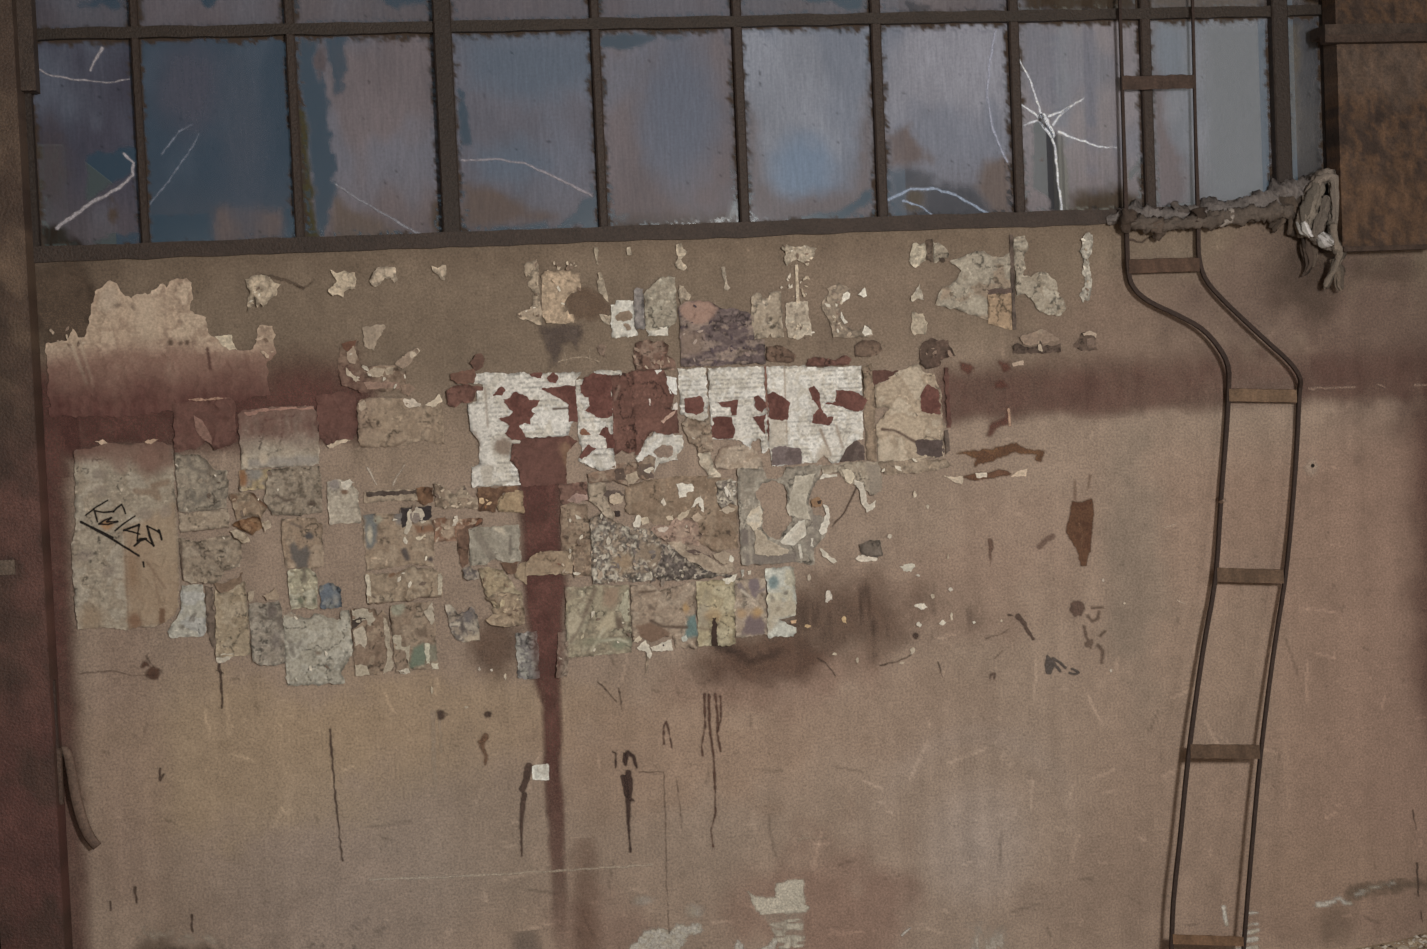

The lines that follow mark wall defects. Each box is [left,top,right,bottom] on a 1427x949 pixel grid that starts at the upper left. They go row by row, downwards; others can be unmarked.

peeling [245,275,281,312]
peeling [328,266,398,297]
peeling [432,265,447,280]
peeling [516,247,611,325]
peeling [675,243,691,305]
peeling [780,244,873,340]
peeling [909,242,953,358]
peeling [1079,232,1093,302]
peeling [45,278,277,418]
peeling [338,324,420,396]